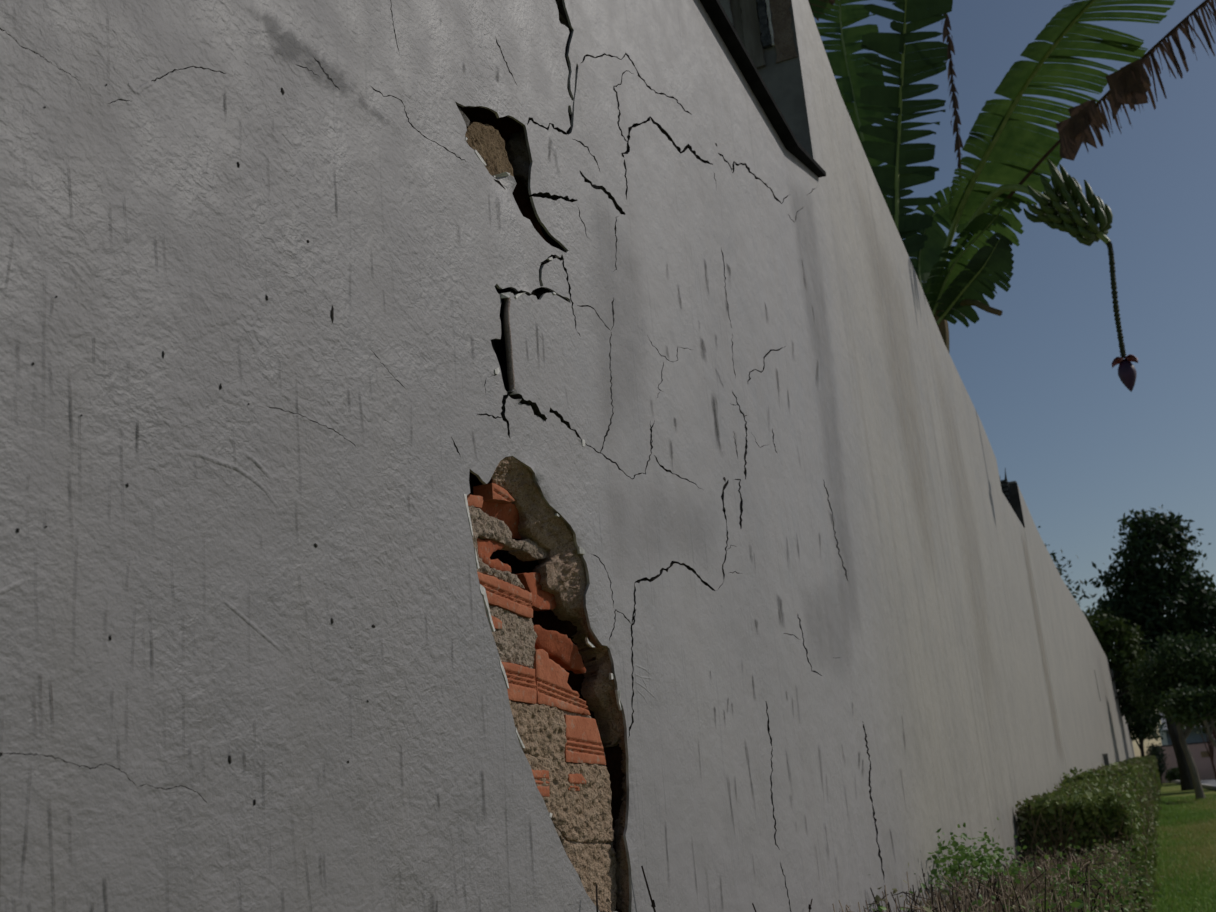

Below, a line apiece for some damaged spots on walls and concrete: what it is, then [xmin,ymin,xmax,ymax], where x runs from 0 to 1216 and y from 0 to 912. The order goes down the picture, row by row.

crack [0,28,80,81]
crack [152,66,226,81]
spalling [456,104,566,391]
crack [476,0,822,737]
crack [823,479,849,582]
spalling [464,456,629,912]
crack [3,752,206,802]
crack [766,703,791,911]
crack [863,723,886,898]